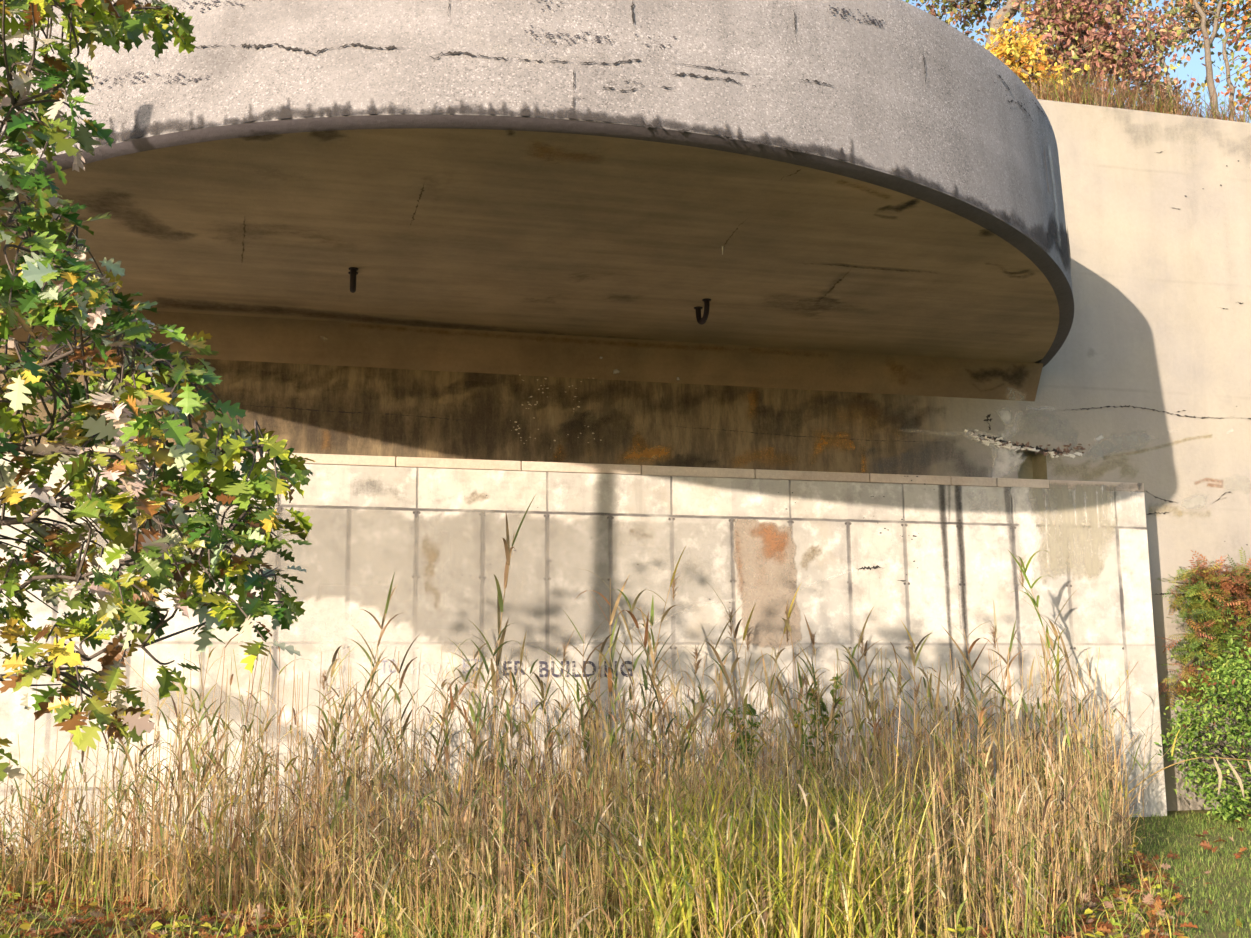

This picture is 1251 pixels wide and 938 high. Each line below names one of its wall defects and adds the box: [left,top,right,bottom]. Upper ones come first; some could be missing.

crack [196,43,396,55]
crack [430,51,756,108]
leakage [224,102,1071,269]
crack [1063,405,1251,419]
flaking render [965,429,1090,459]
leakage [660,458,706,467]
corrosion [734,519,802,648]